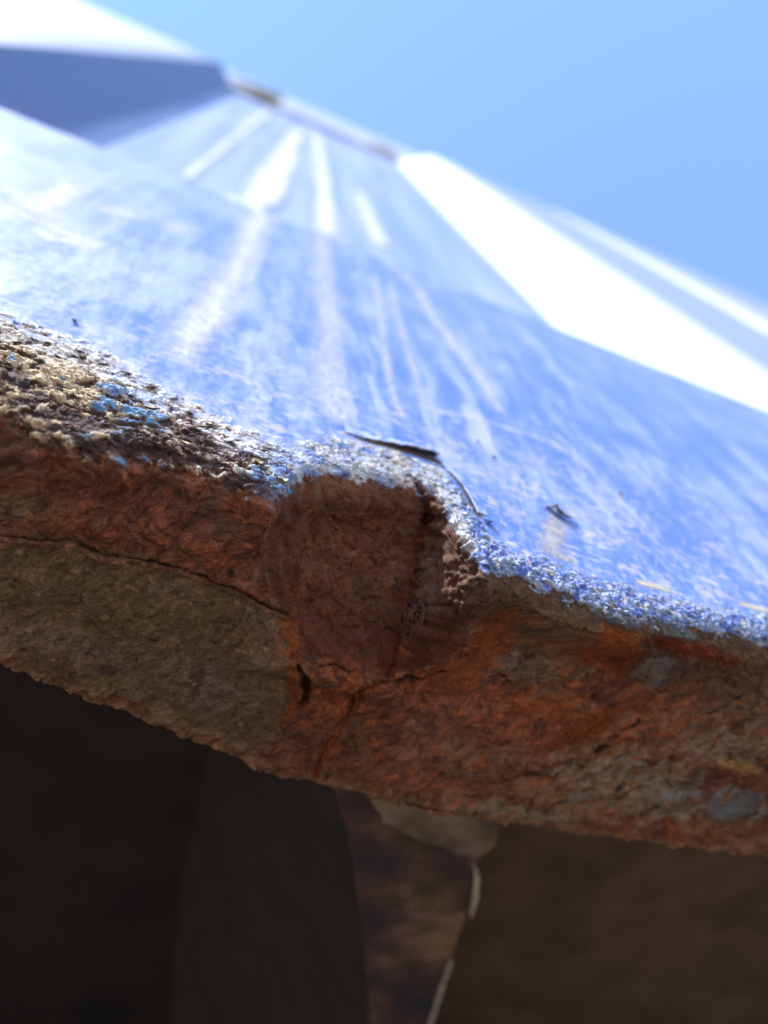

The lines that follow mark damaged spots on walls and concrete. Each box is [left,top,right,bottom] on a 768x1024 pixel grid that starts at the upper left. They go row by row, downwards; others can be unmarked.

peeling [0,305,768,648]
crack [414,482,429,504]
crack [22,536,282,614]
crack [297,530,443,778]
corrosion [580,625,740,677]